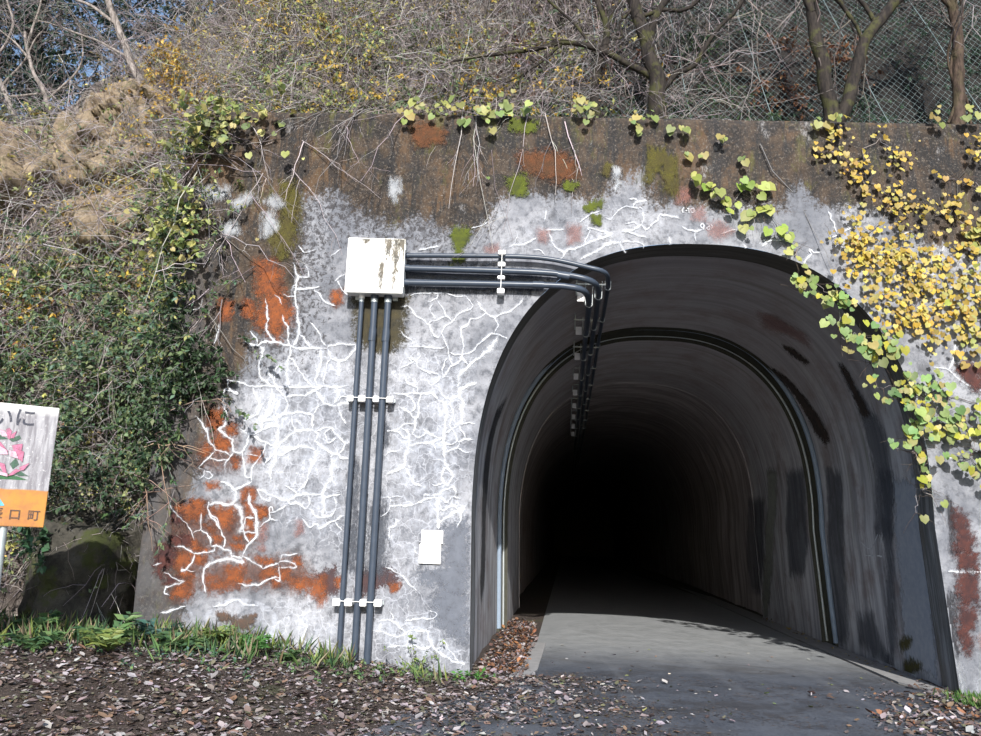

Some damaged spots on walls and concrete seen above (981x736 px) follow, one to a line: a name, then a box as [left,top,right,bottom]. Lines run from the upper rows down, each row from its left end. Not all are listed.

rust [409,122,448,148]
rust [514,146,582,184]
crack [490,183,856,263]
rust [218,257,296,342]
rust [198,406,264,470]
crack [156,248,356,613]
crack [382,292,522,538]
rust [150,487,341,607]
damp [747,469,808,618]
crack [375,610,465,665]